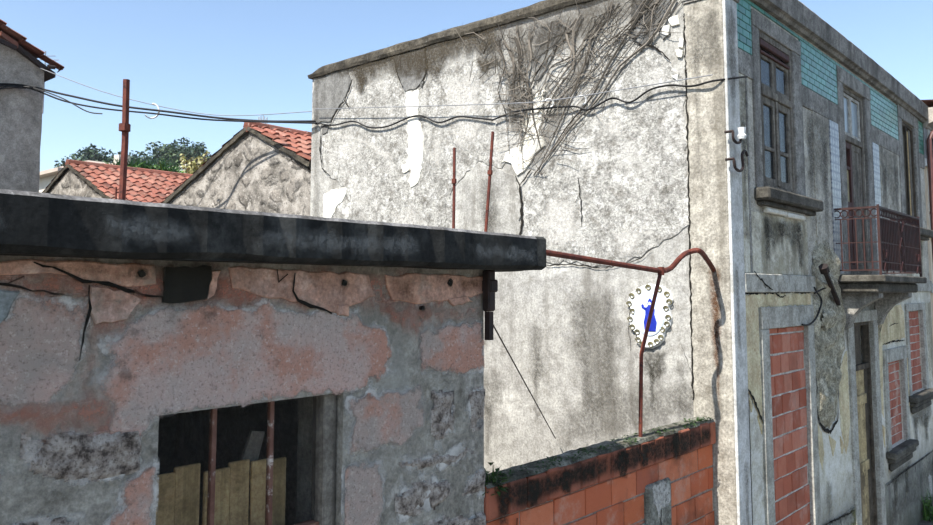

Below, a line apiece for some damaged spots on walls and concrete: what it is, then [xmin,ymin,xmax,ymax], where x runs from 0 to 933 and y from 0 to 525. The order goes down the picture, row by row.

crack [319,79,353,176]
spalling [312,0,689,267]
crack [515,170,531,235]
crack [574,179,582,226]
crack [634,13,694,400]
crack [0,262,164,361]
crack [277,269,332,314]
crack [547,250,650,268]
spalling [745,240,850,470]
damp [653,483,670,515]